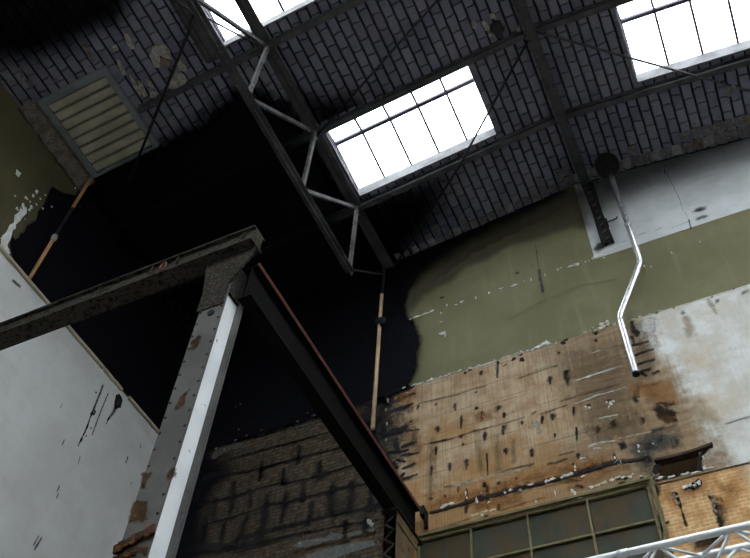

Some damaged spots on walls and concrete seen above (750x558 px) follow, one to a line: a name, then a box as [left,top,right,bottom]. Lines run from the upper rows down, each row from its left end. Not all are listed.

spalling [112,44,158,98]
spalling [149,43,188,90]
crack [578,137,750,229]
peeling [1,190,53,254]
peeling [630,307,675,346]
peeling [402,338,568,389]
water stain [589,414,652,449]
rust [129,501,148,522]
spalling [429,444,647,517]
spalling [652,449,726,528]